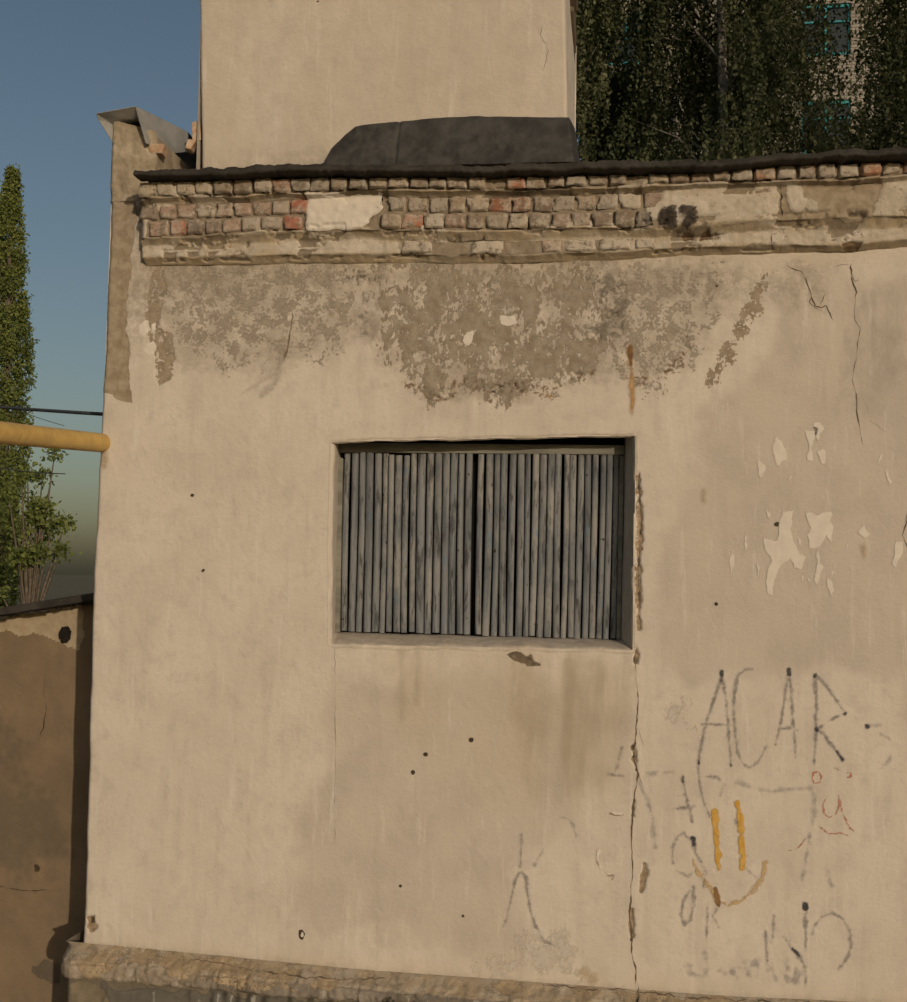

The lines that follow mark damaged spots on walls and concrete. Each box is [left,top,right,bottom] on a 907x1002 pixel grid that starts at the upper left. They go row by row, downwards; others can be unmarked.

spalling [185,121,202,154]
flaking render [103,163,907,411]
crack [771,236,884,440]
peeling [758,436,787,477]
peeling [804,422,826,464]
spalling [634,475,643,631]
peeling [756,509,834,596]
crack [542,647,770,1002]
water stain [100,981,324,1002]